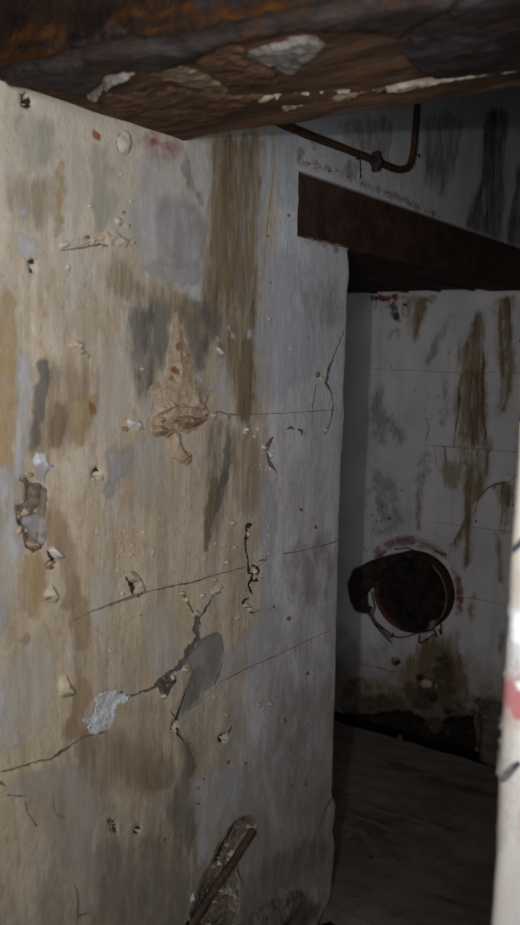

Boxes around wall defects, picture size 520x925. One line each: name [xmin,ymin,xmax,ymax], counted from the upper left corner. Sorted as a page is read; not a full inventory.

leakage [120,135,265,551]
leakage [498,297,520,411]
peeling [13,452,65,570]
leakage [0,294,127,613]
leakage [436,313,512,567]
crack [127,521,271,760]
spalling [82,690,131,735]
crack [0,731,108,827]
spalling [189,814,256,925]